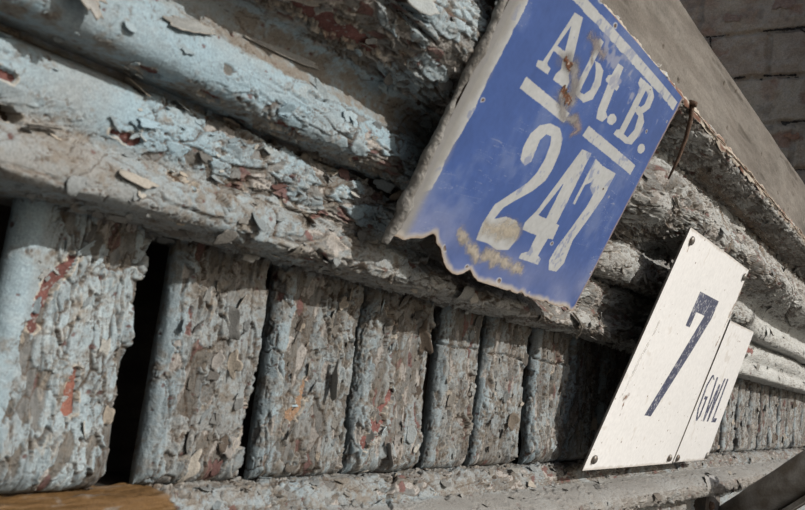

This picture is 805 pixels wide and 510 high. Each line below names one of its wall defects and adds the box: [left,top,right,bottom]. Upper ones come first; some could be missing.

peeling [81,0,108,21]
peeling [407,0,440,16]
peeling [0,68,20,83]
peeling [110,61,220,160]
peeling [212,179,289,248]
peeling [96,395,115,431]
peeling [172,404,241,510]
peeling [203,295,251,381]
peeling [330,359,351,401]
peeling [360,385,419,504]
peeling [478,303,633,510]
peeling [705,325,799,495]